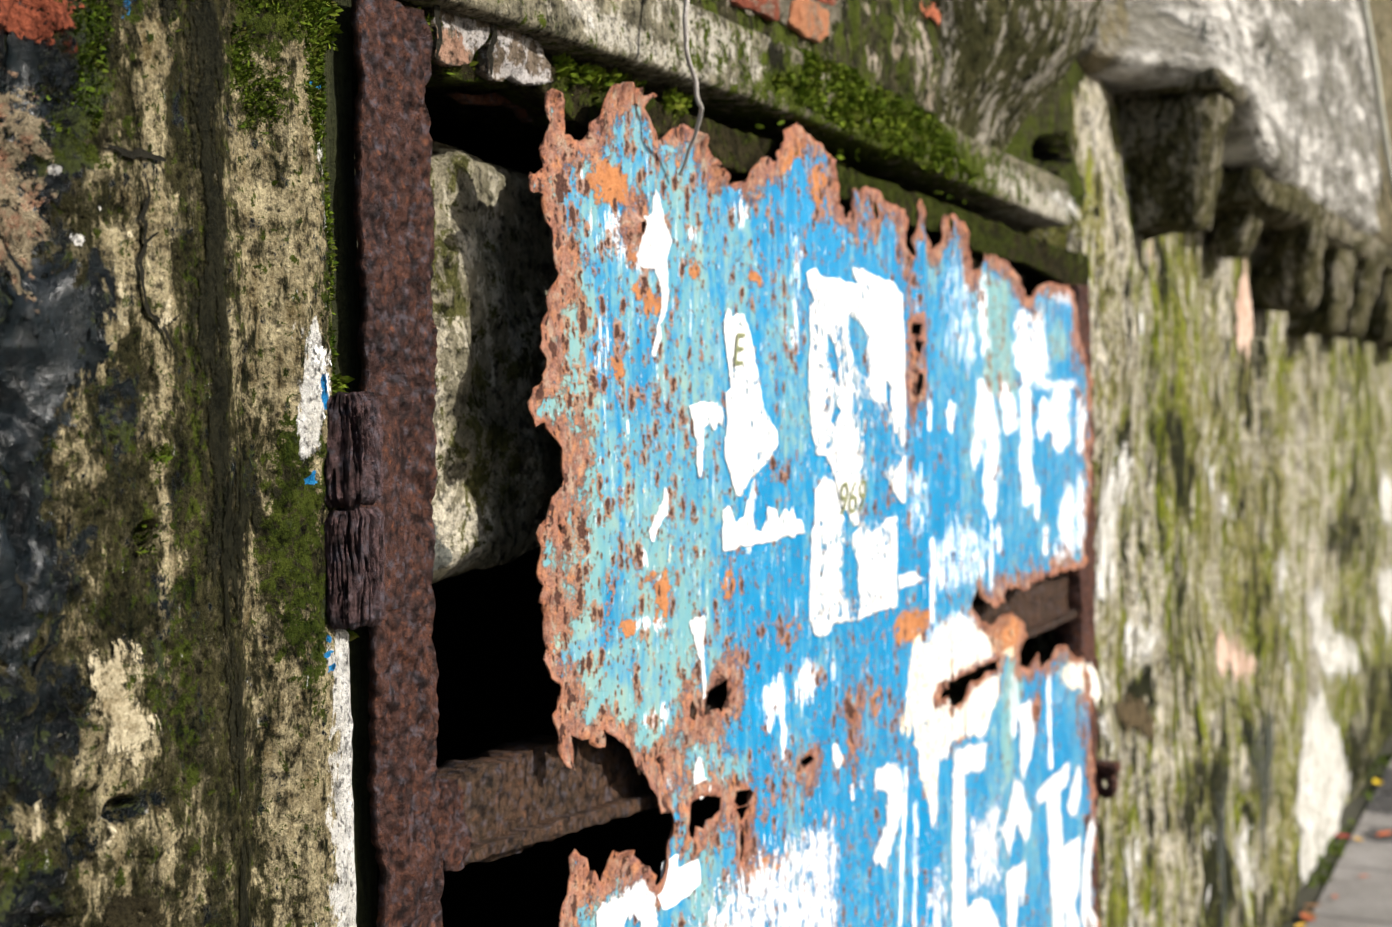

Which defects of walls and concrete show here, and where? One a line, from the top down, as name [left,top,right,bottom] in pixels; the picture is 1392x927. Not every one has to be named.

leakage [0,0,65,215]
leakage [763,32,787,74]
leakage [0,232,107,683]
leakage [152,0,283,927]
peeling [909,612,1000,831]
leakage [1244,696,1275,868]
leakage [1360,769,1392,845]